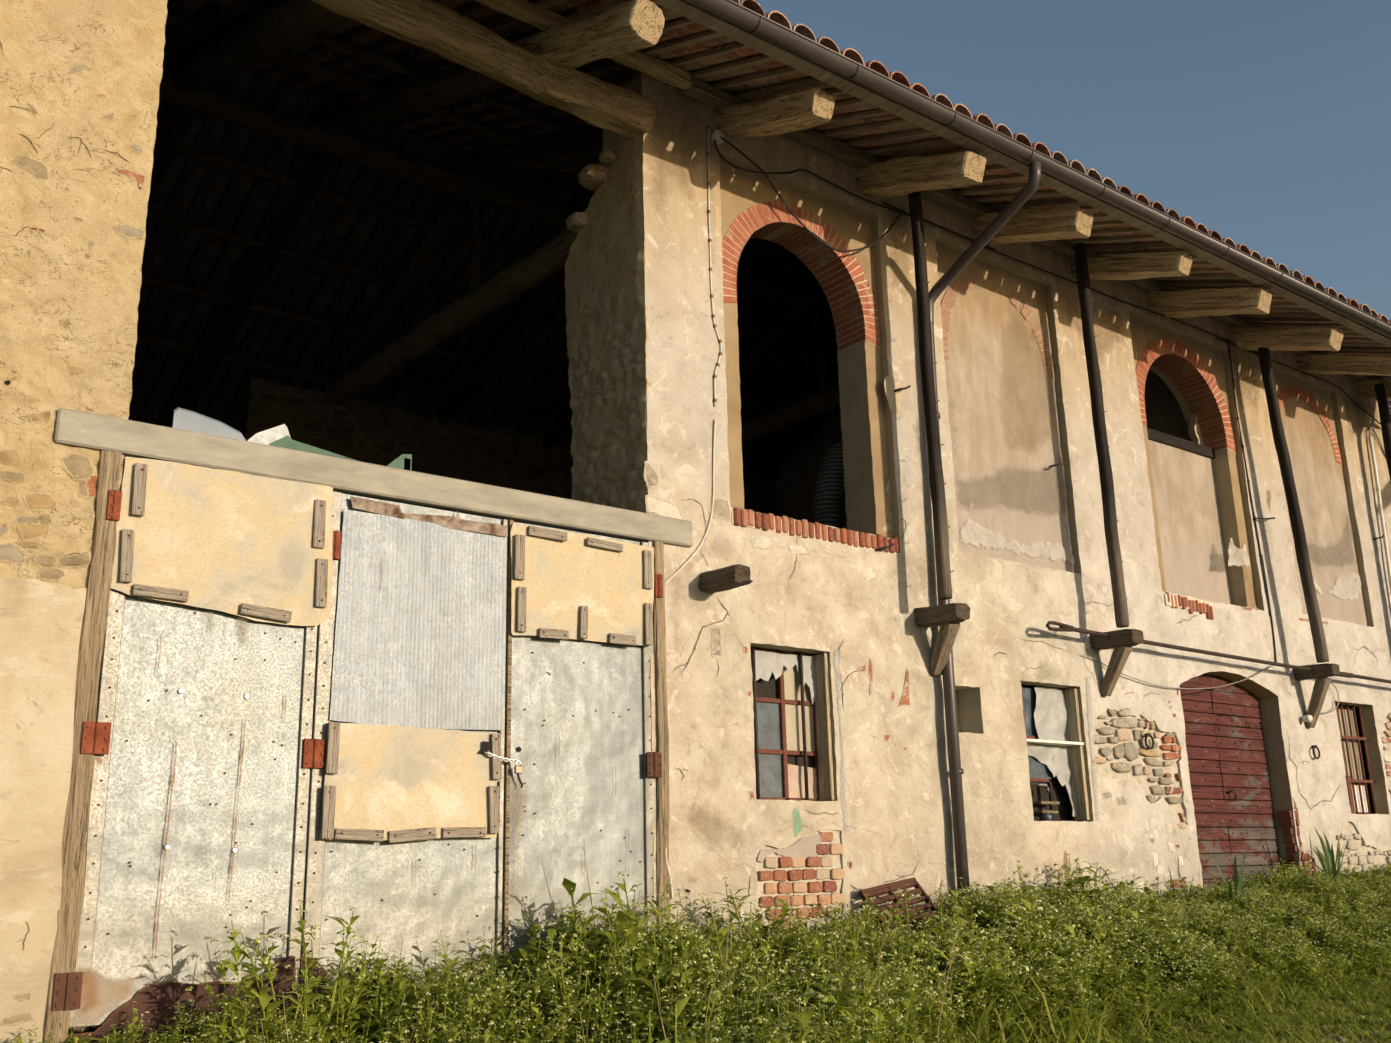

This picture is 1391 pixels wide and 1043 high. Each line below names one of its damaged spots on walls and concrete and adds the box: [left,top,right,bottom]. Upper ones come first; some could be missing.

crack [0,106,129,173]
damp [961,465,1074,563]
crack [673,498,730,676]
spalling [1093,689,1202,892]
spalling [1381,709,1391,795]
spalling [734,829,853,932]
spalling [1336,822,1391,877]
rust [68,956,330,1043]